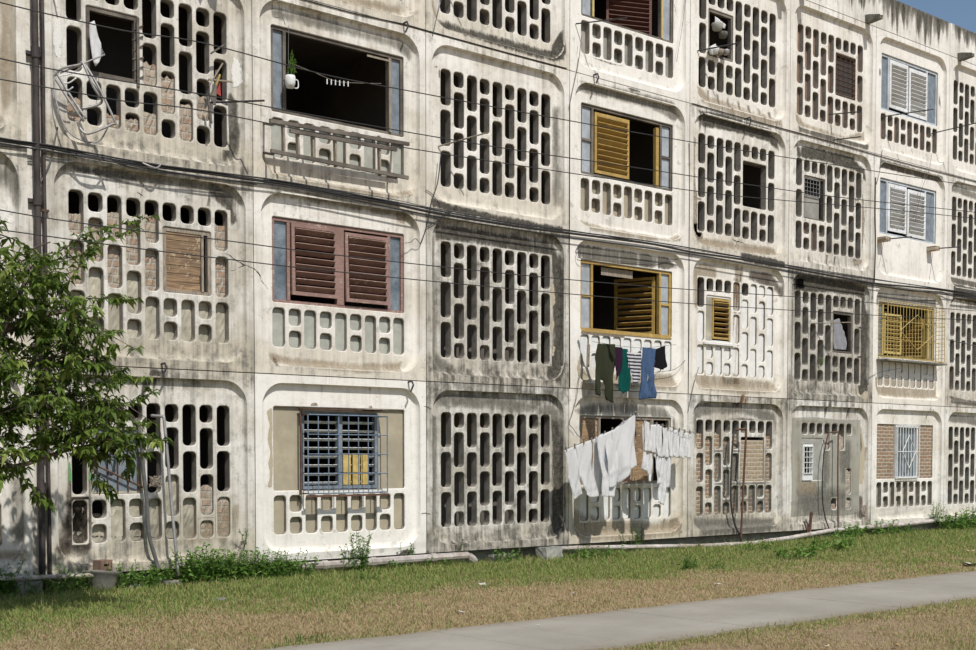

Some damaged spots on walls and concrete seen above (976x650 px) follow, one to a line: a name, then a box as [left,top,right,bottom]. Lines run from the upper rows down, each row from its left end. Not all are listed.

damp [882,0,976,45]
damp [439,393,681,538]